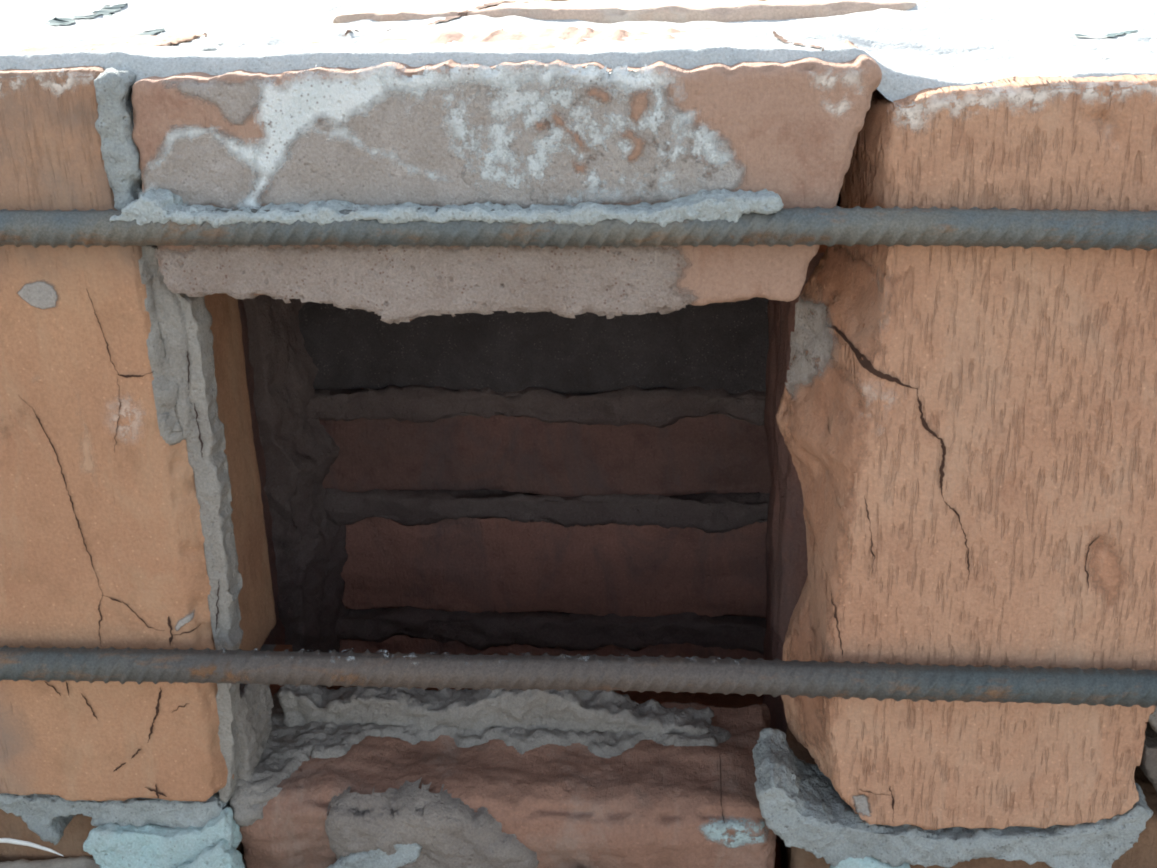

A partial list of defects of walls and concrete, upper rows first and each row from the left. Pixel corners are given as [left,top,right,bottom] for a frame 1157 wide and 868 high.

water stain [167,62,730,209]
spalling [155,245,695,324]
crack [86,288,154,451]
crack [187,352,203,458]
crack [826,324,970,580]
crack [18,395,220,646]
crack [830,591,843,657]
crack [44,681,97,718]
crack [113,687,189,772]
crack [144,784,167,799]
spalling [853,795,871,816]